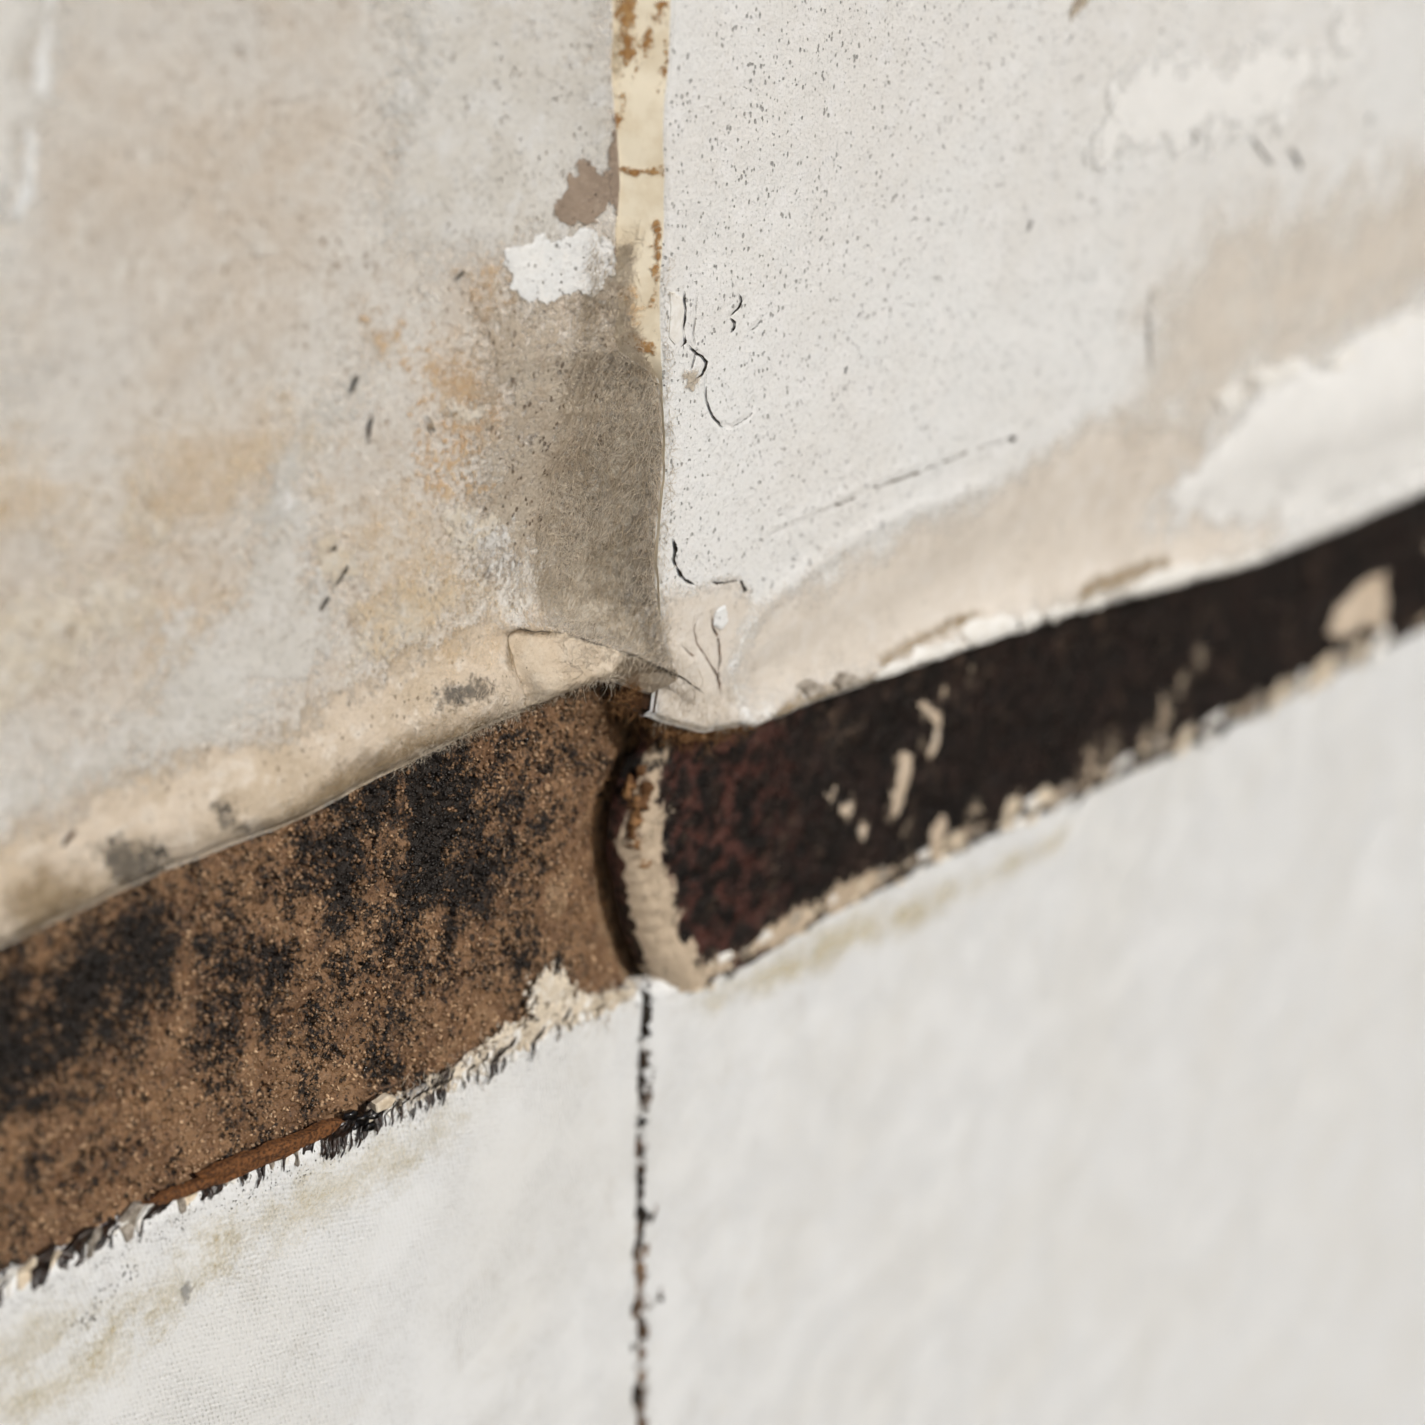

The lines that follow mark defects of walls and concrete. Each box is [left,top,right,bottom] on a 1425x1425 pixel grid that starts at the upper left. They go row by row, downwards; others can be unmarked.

corrosion [614,0,669,92]
corrosion [620,165,664,177]
peeling [341,0,659,677]
corrosion [617,220,662,356]
spalling [311,525,376,611]
peeling [657,283,1425,731]
peeling [692,571,1389,994]
peeling [371,952,660,1121]
crack [630,968,664,1425]